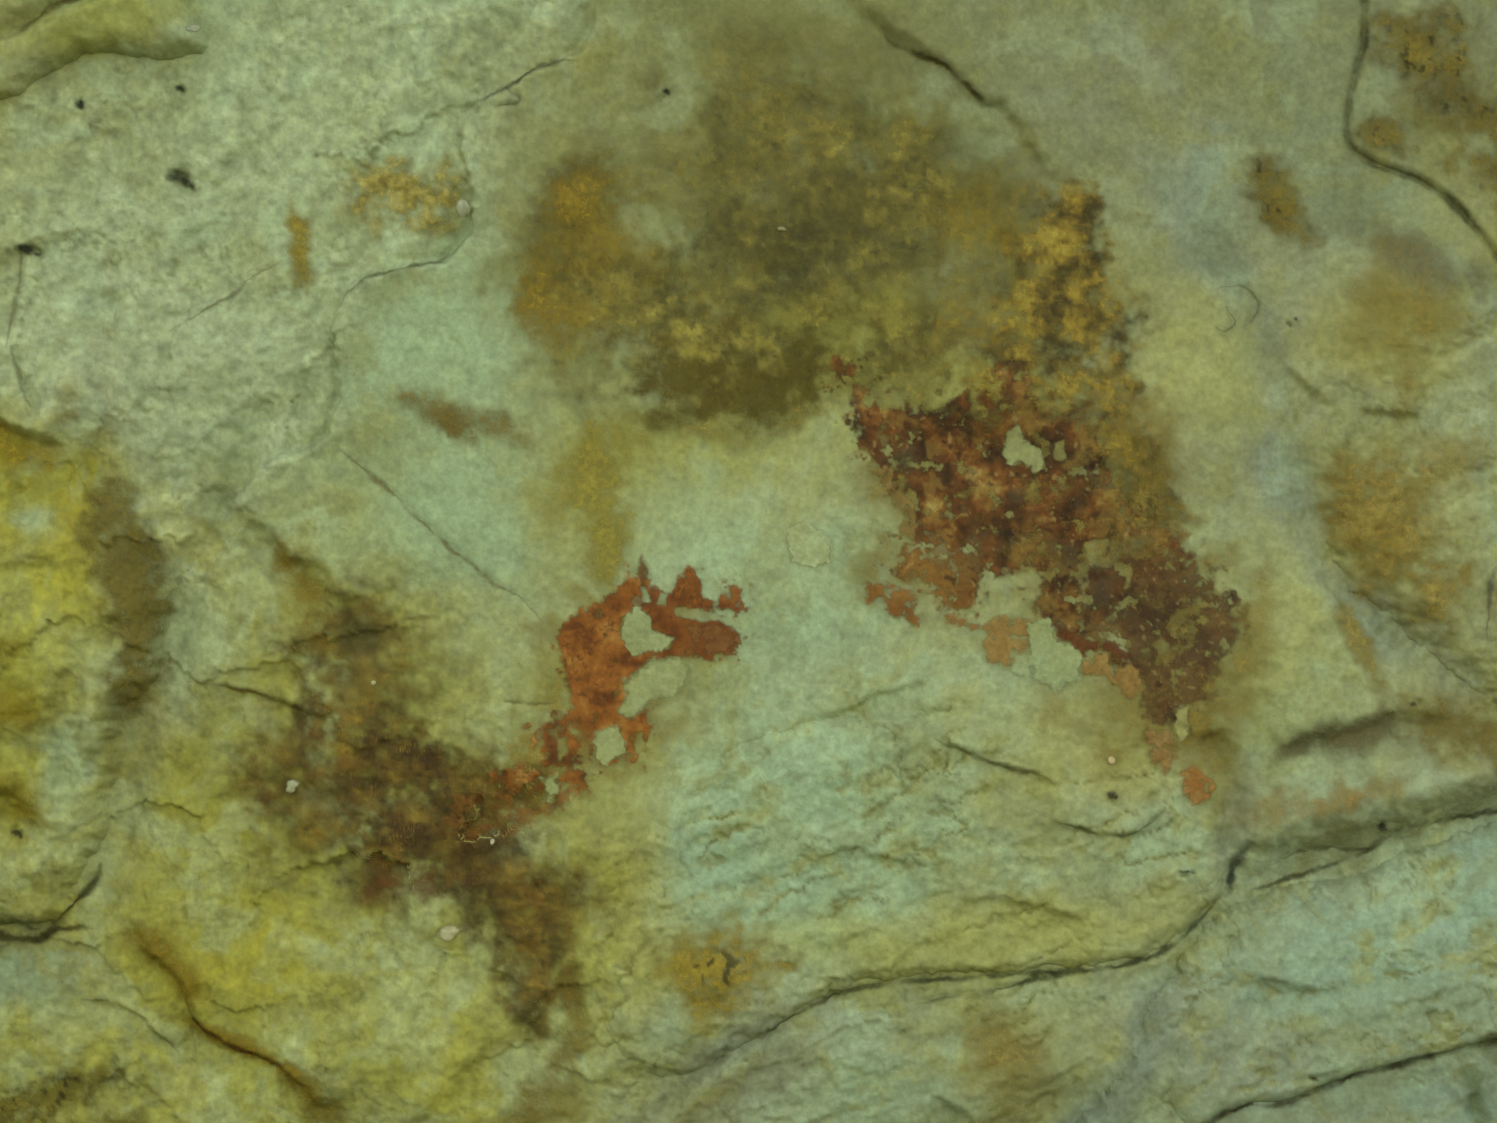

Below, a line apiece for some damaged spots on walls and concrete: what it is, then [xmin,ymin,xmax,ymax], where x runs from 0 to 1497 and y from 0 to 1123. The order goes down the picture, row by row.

crack [892,42,981,101]
crack [1346,24,1477,229]
water stain [1377,7,1497,189]
water stain [514,46,1036,441]
water stain [559,419,634,582]
rust [830,179,1251,805]
rust [454,557,748,835]
crack [0,875,99,943]
water stain [234,592,589,1123]
crack [1434,809,1497,823]